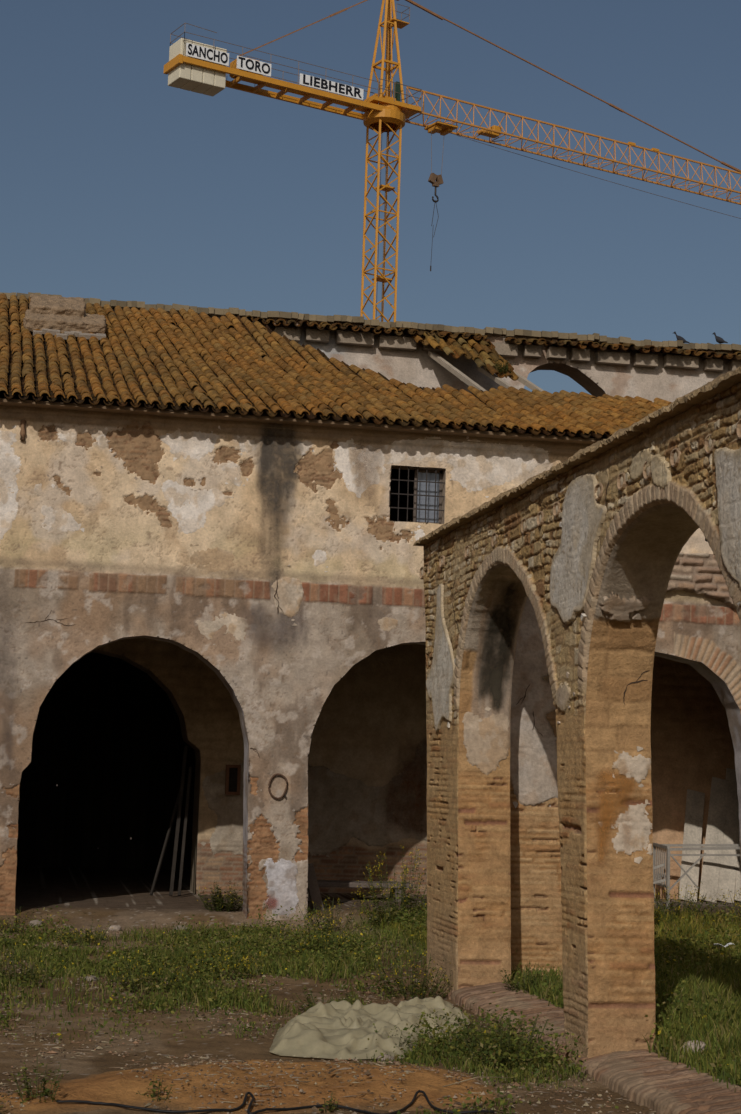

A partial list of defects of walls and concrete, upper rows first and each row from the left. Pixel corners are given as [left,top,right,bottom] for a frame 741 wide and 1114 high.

peeling [0,425,21,540]
spalling [34,421,257,578]
leakage [258,425,299,526]
spalling [365,515,425,550]
peeling [293,436,549,532]
leakage [479,583,516,710]
peeling [598,746,653,864]